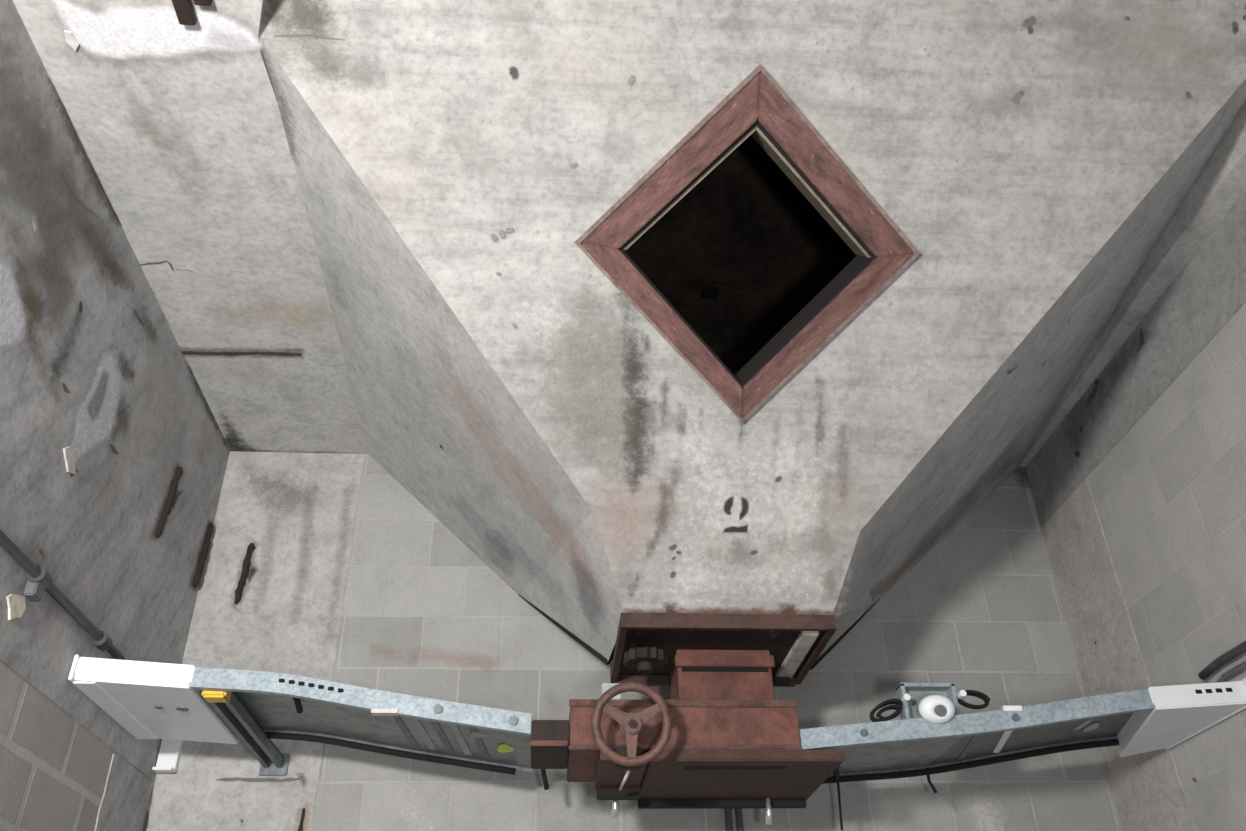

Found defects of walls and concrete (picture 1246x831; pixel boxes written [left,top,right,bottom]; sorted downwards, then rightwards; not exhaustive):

peeling [53,0,294,149]
peeling [63,352,122,476]
damp [551,301,647,491]